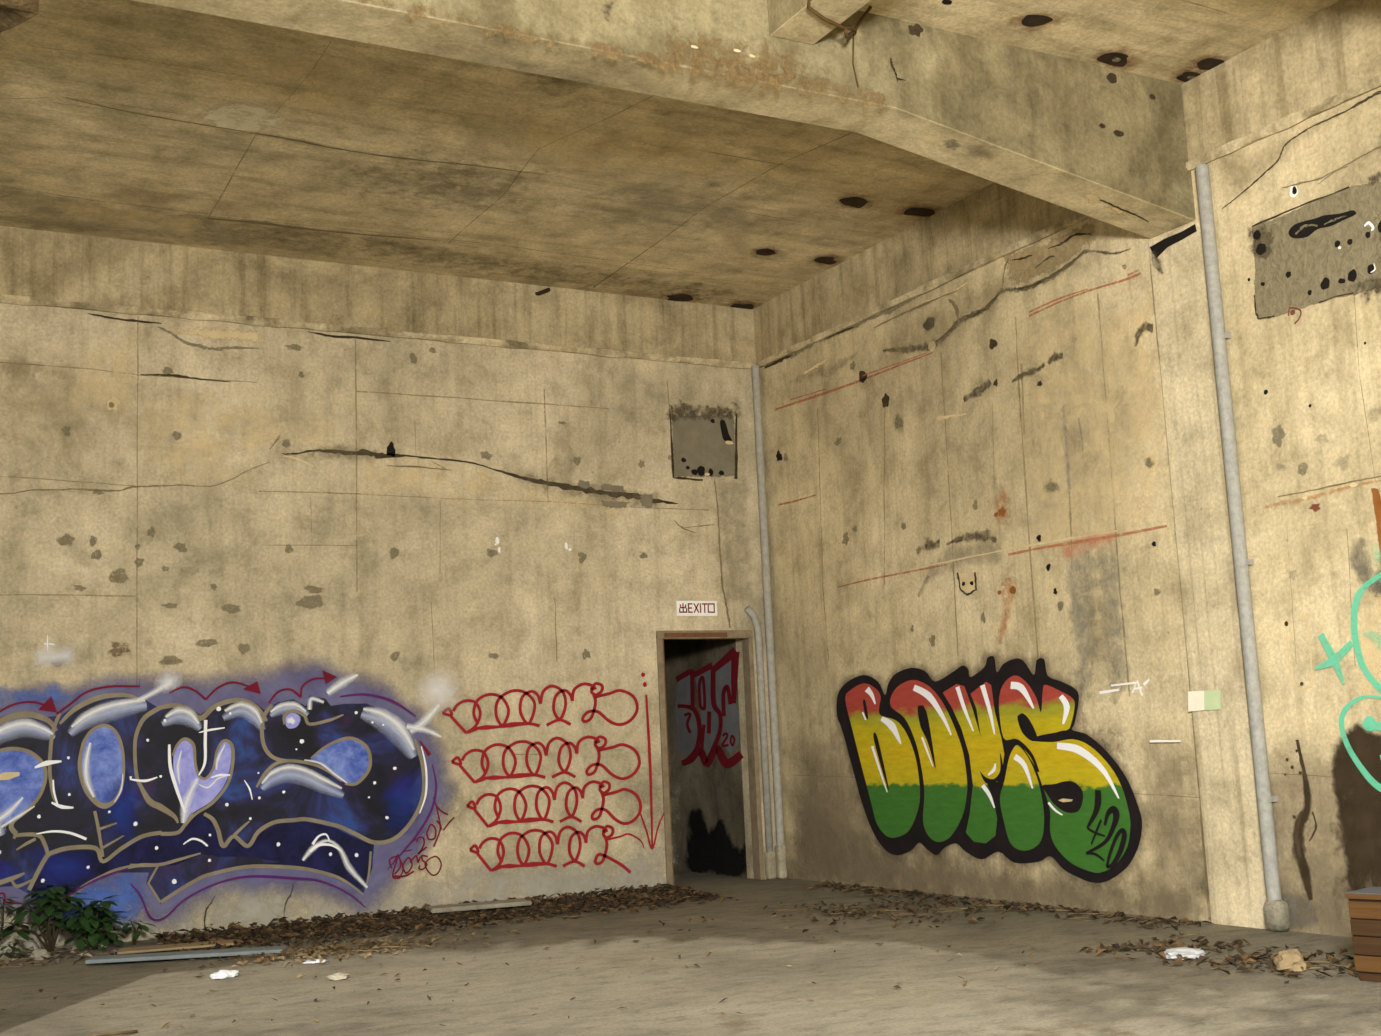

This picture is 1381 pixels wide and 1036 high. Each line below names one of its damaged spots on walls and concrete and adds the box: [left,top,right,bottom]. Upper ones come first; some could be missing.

crack [890,58,906,81]
crack [883,90,1381,353]
crack [0,435,731,628]
rust [1278,476,1381,563]
damp [1270,724,1381,938]